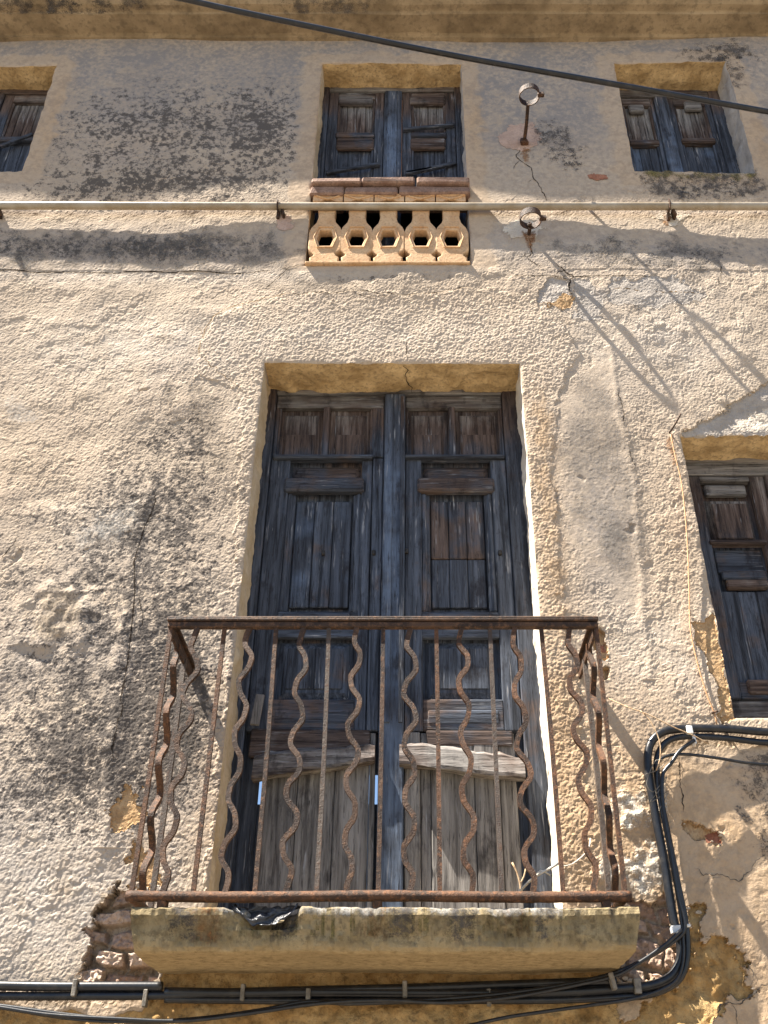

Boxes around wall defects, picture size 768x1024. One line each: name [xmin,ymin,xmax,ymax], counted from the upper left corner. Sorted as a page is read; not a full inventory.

water stain [533,120,582,170]
water stain [640,170,768,200]
peeling [537,274,706,320]
crack [2,264,468,385]
peeling [691,613,734,724]
crack [678,758,686,811]
crack [697,854,765,886]
flaking render [0,784,755,1024]